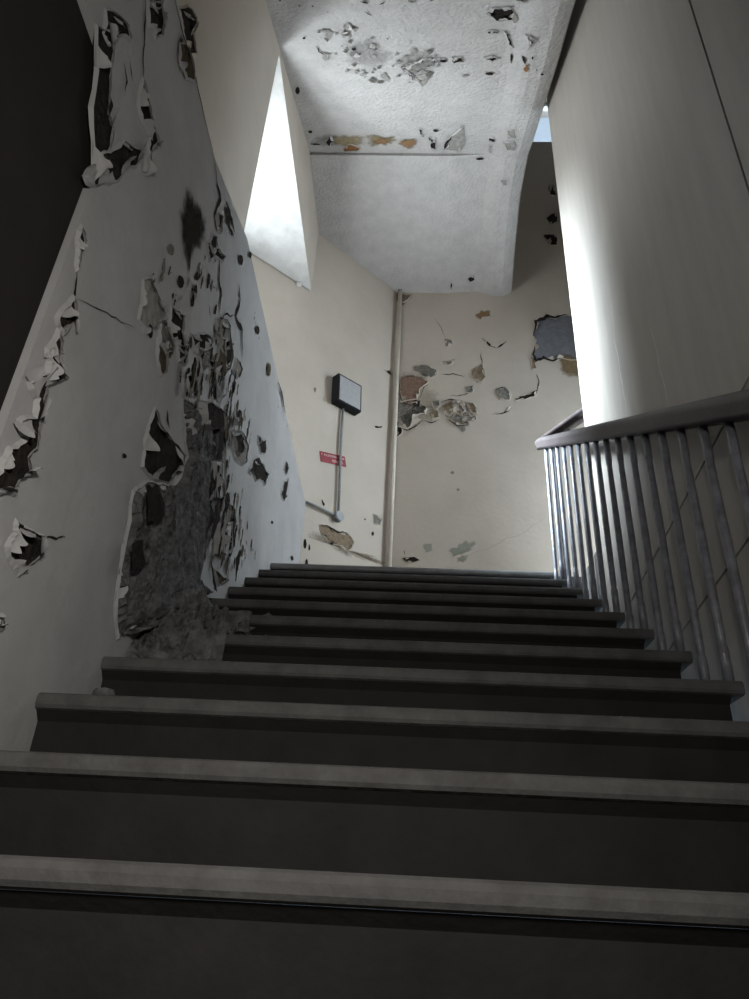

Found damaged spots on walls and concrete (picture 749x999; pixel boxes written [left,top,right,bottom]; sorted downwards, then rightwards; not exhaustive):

peeling [316,23,464,86]
flaking render [483,0,544,75]
peeling [82,0,199,188]
peeling [418,125,466,152]
peeling [476,129,516,160]
peeling [0,223,88,497]
flaking render [530,314,579,375]
peeling [397,354,486,437]
flaking render [495,387,511,401]
flaking render [113,244,269,640]
flaking render [4,518,65,578]
peeling [319,524,354,552]